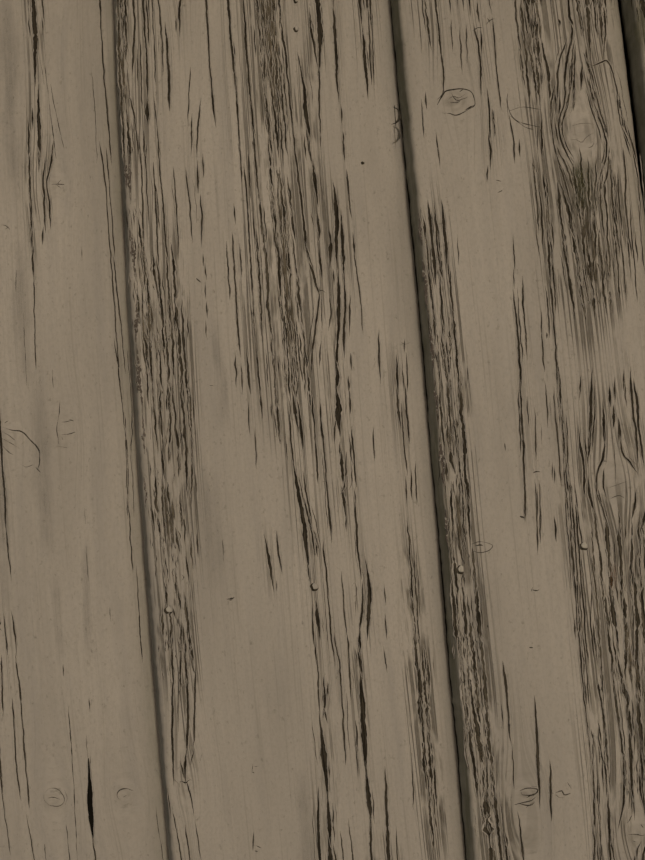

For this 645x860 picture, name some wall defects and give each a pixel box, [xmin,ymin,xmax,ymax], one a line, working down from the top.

crack [4,0,64,385]
crack [0,404,75,581]
crack [0,612,97,860]
peeling [116,0,199,688]
peeling [252,0,311,407]
peeling [406,520,442,853]
peeling [429,308,511,860]
peeling [533,146,621,321]
peeling [591,506,645,813]